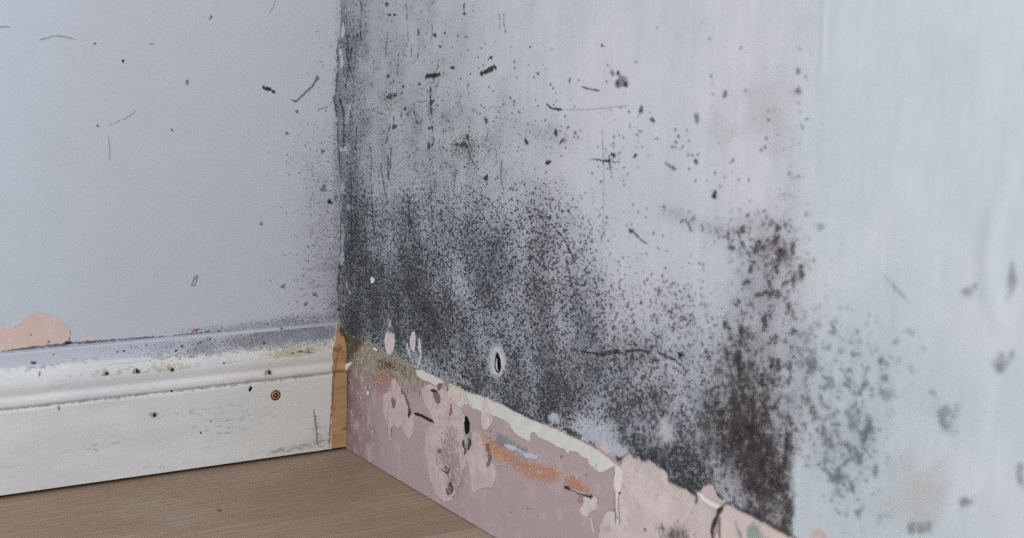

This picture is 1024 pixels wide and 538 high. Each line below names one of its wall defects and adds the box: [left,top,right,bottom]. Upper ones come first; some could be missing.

water stain [141,1,881,538]
peeling [0,312,95,352]
water stain [2,331,166,352]
peeling [373,315,422,368]
peeling [430,383,477,410]
peeling [496,433,539,459]
peeling [582,427,628,457]
peeling [658,420,673,444]
spalling [441,466,454,495]
peeling [697,484,726,509]